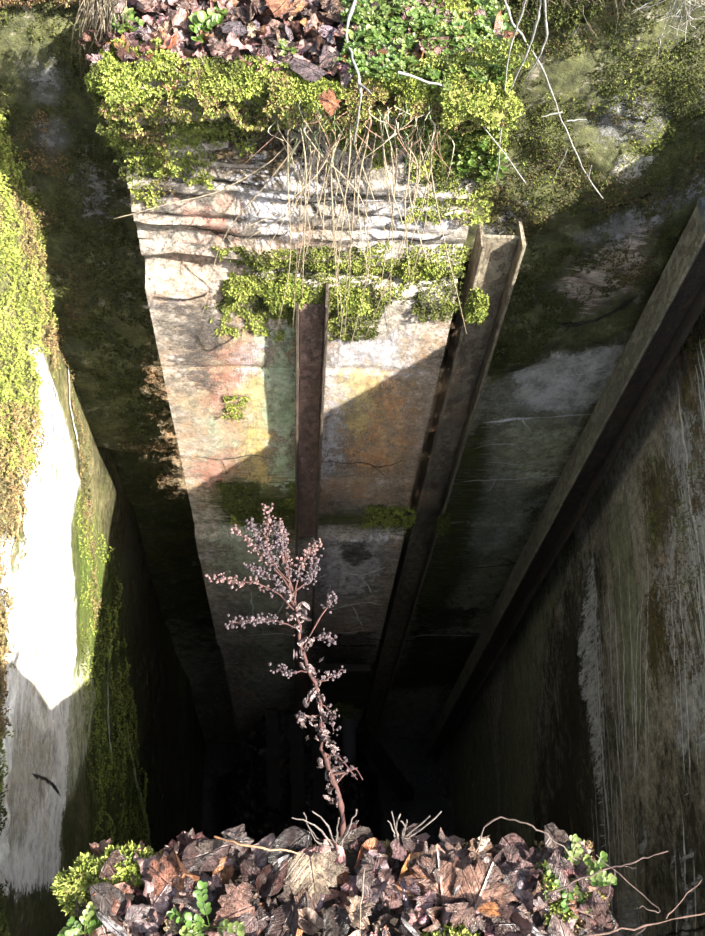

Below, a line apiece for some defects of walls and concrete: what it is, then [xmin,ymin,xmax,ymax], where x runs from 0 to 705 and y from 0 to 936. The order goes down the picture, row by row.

corrosion [319,338,431,508]
crack [328,459,410,477]
water stain [308,526,396,605]
water stain [448,343,705,936]
crack [658,926,705,936]